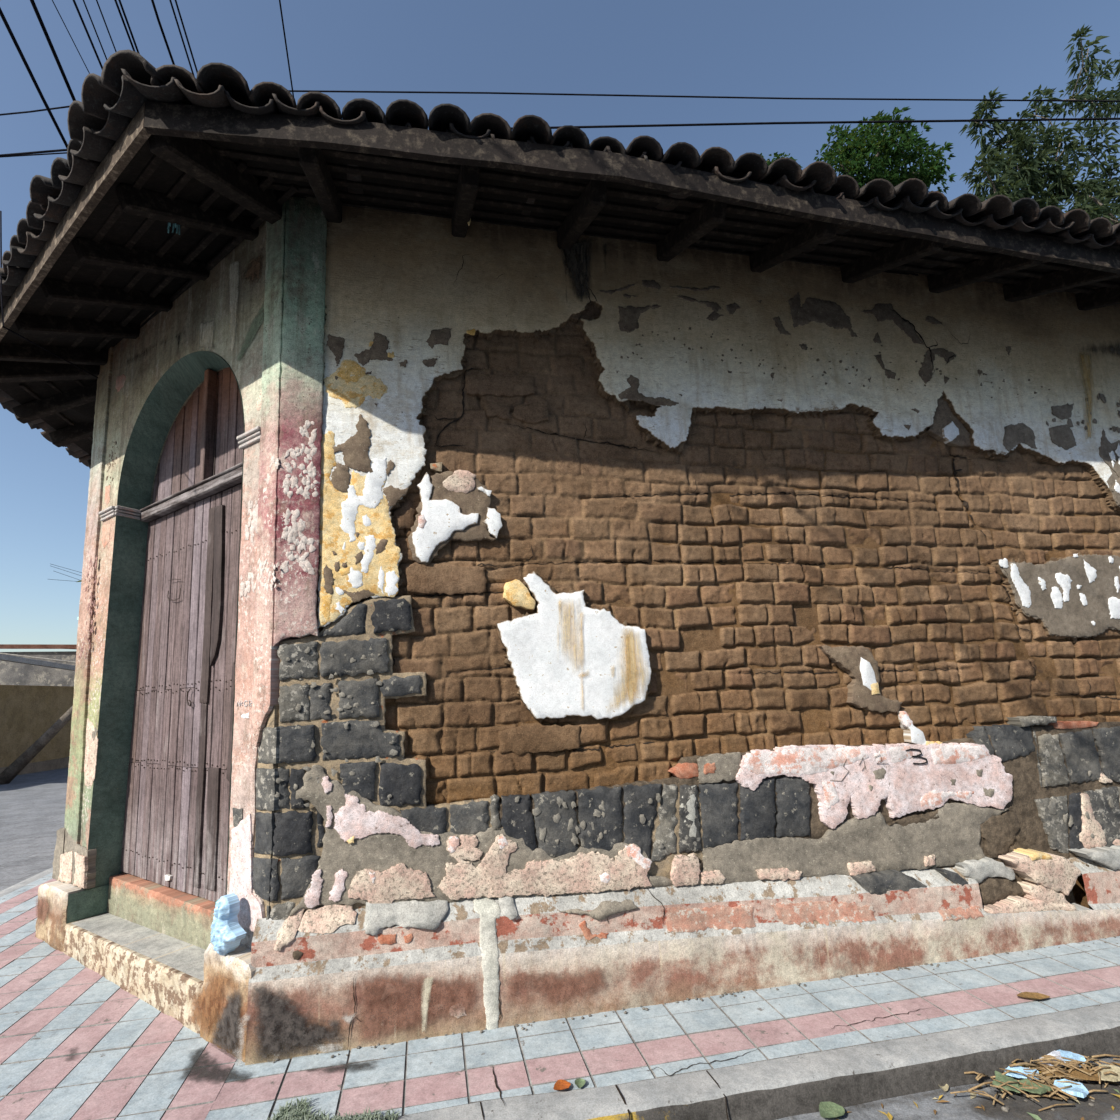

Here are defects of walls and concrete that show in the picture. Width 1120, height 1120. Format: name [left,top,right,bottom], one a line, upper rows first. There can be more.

crack [434,368,473,447]
crack [510,424,653,452]
flaking render [240,280,1120,829]
crack [413,454,1120,700]
peeling [274,776,652,960]
peeling [670,853,726,887]
peeling [755,867,802,881]
peeling [847,861,876,876]
peeling [666,904,756,933]
peeling [771,901,877,926]
damp [182,987,354,1082]
damp [307,1062,371,1072]